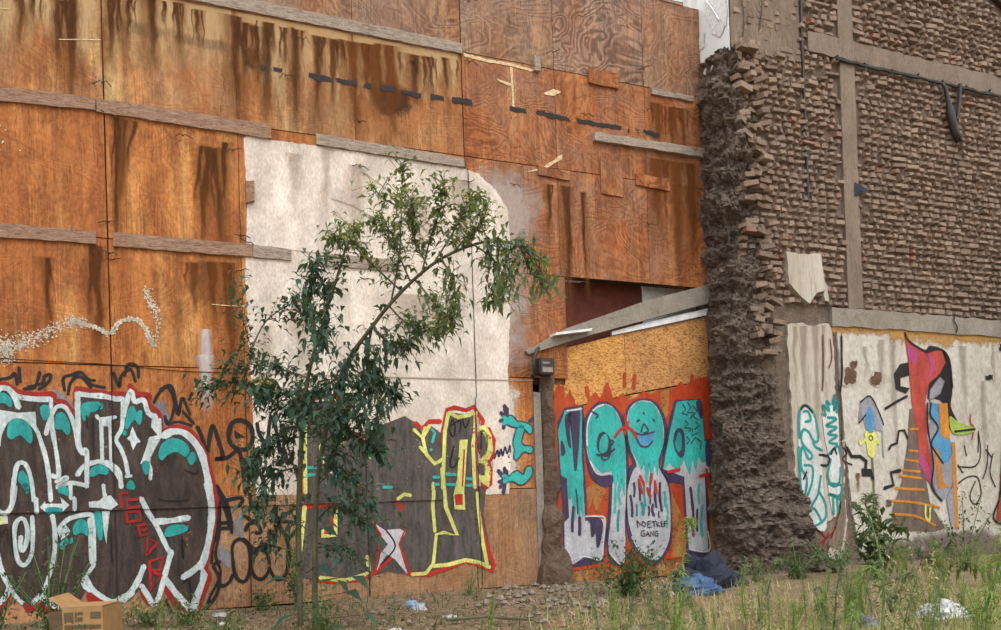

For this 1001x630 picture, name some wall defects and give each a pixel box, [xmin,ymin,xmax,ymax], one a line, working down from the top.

damp [53,0,77,65]
damp [107,0,205,41]
damp [225,14,458,105]
damp [111,117,137,208]
damp [196,142,231,218]
damp [546,184,586,277]
damp [649,158,695,244]
peeling [781,251,829,305]